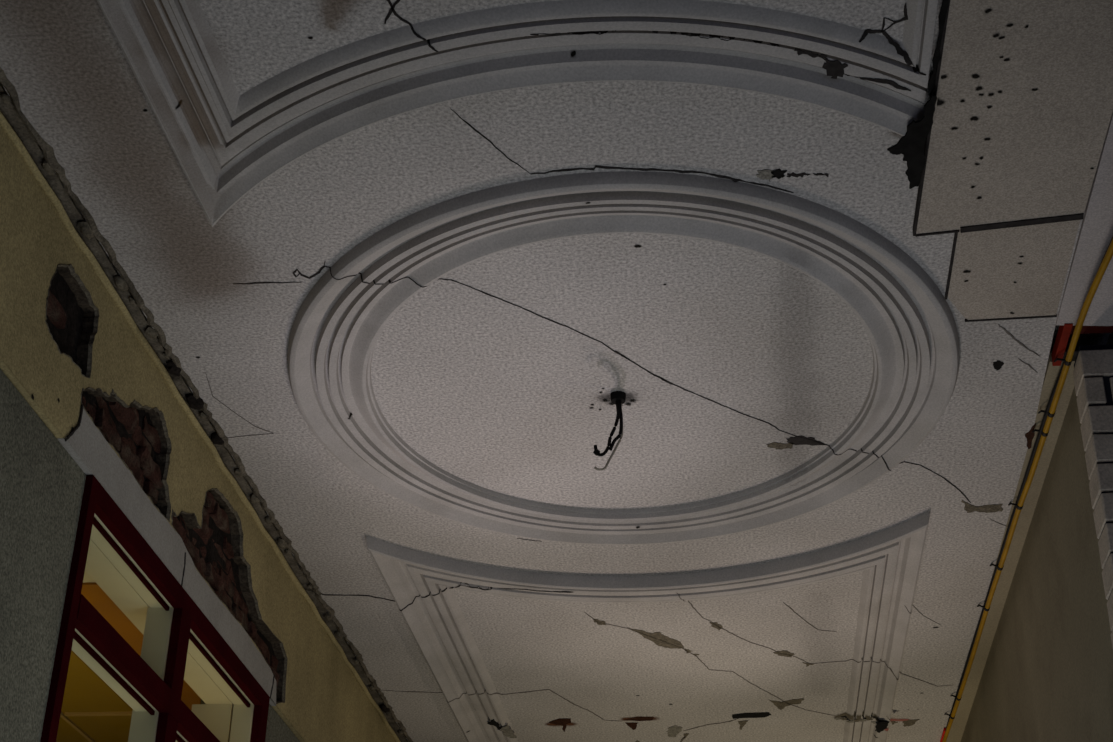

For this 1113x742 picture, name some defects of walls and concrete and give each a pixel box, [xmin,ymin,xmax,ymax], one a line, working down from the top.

crack [384,0,439,52]
crack [530,29,617,37]
crack [652,31,781,46]
crack [844,3,926,91]
flaking render [887,0,949,189]
flaking render [756,169,829,182]
flaking render [0,67,413,742]
crack [235,262,1008,527]
crack [305,582,835,716]
peeling [628,627,699,656]
flaking render [732,698,804,730]
flaking render [834,712,920,733]